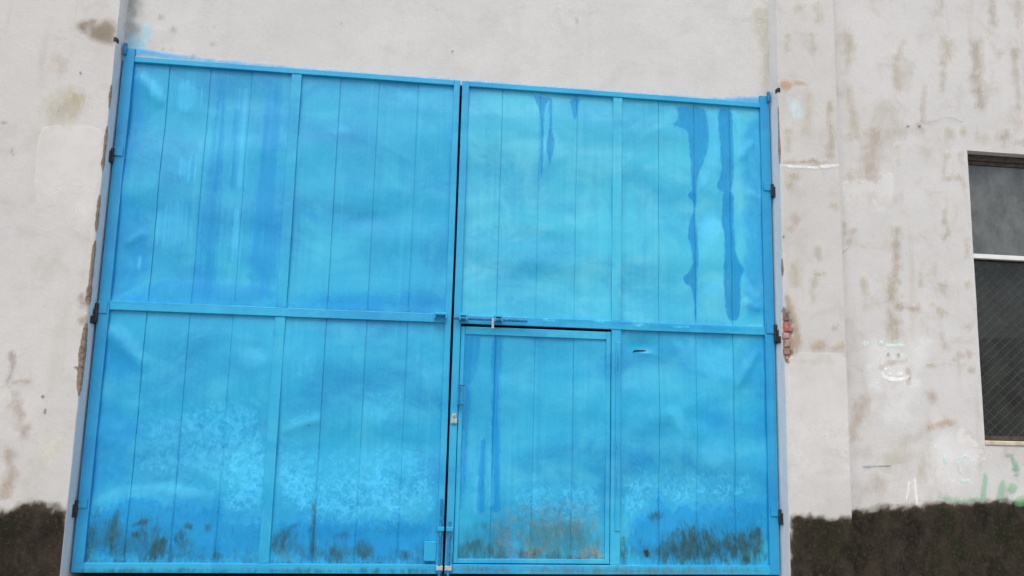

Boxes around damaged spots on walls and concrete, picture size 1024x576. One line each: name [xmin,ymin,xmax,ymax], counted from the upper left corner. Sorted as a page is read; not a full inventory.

spalling [782,296,800,364]
damp [0,502,66,576]
damp [790,500,1024,576]